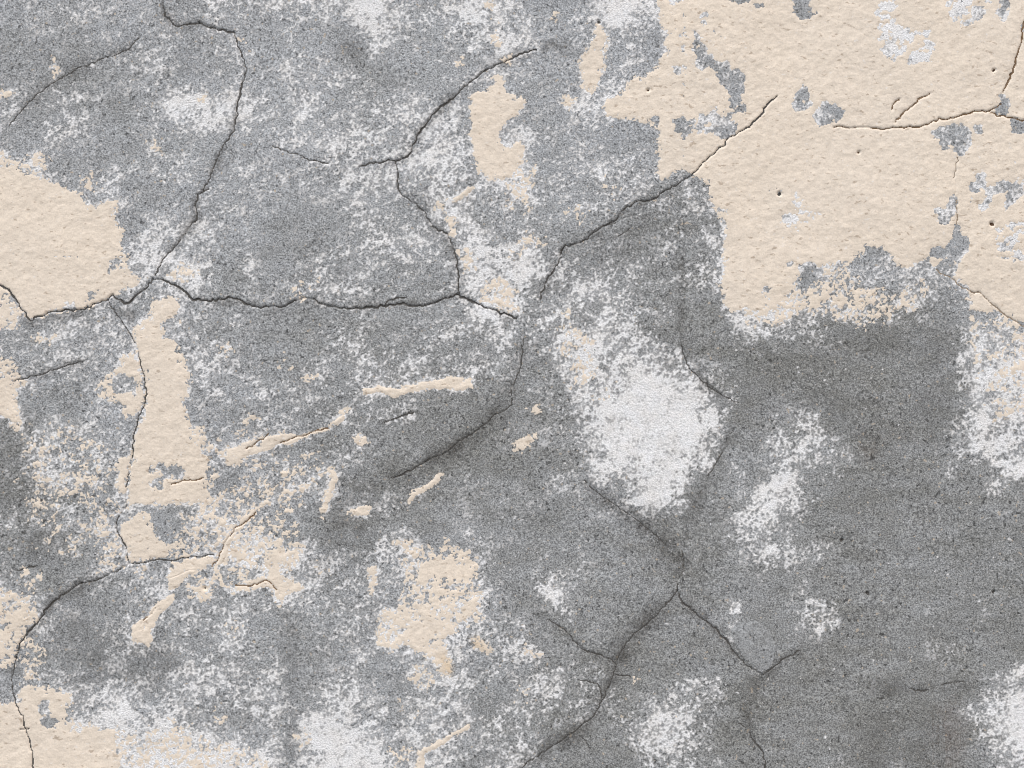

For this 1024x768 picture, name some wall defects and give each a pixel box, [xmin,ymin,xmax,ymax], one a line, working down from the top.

crack [834,21,1024,130]
peeling [0,151,141,330]
peeling [433,74,537,314]
crack [540,96,777,300]
peeling [602,0,1024,423]
peeling [0,295,351,648]
crack [0,7,537,768]
peeling [362,376,473,398]
crack [681,345,739,403]
peeling [0,565,268,768]
peeling [375,536,494,690]
crack [521,480,801,768]